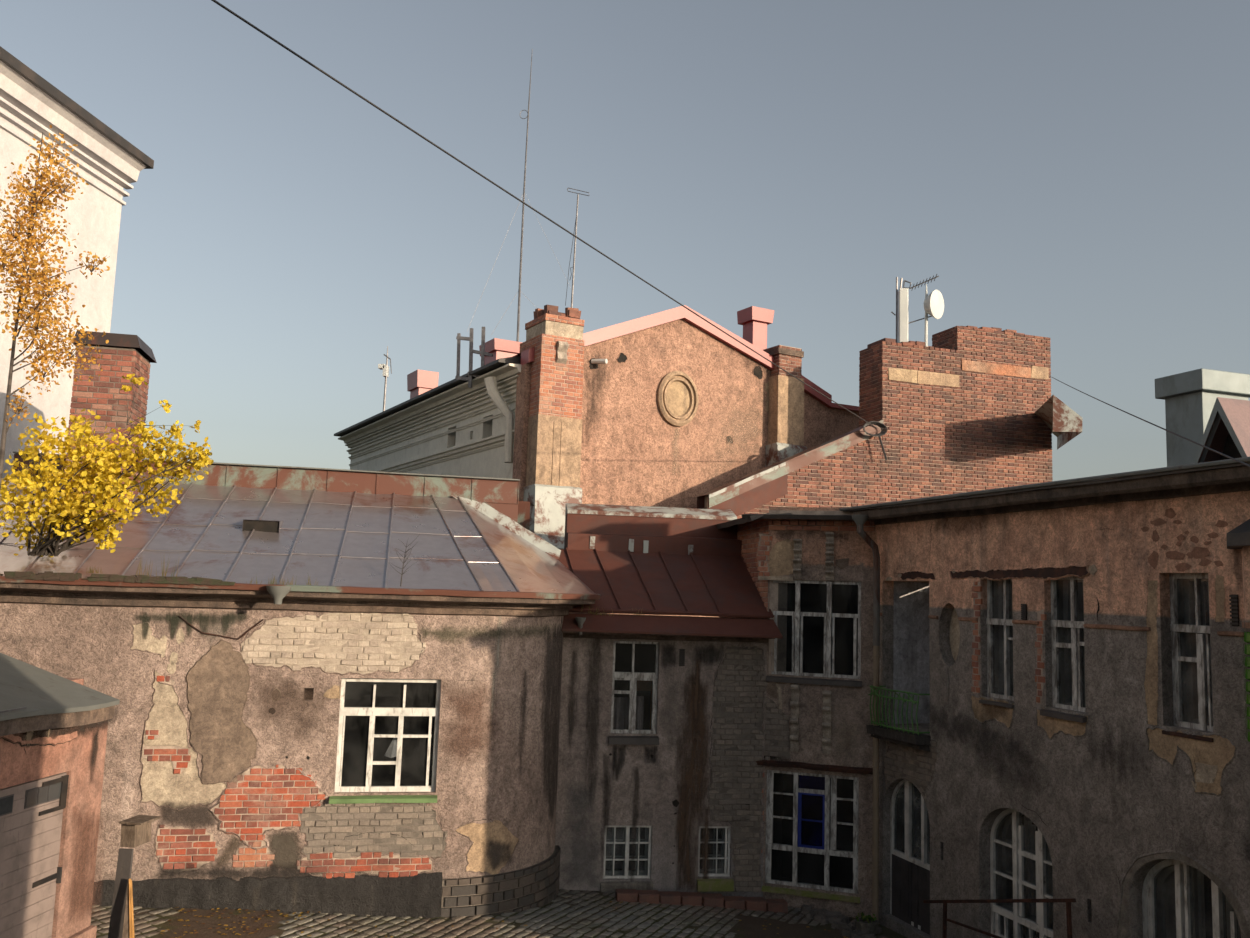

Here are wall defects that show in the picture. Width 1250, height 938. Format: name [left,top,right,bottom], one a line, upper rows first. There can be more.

leakage [170,615,230,639]
flaking render [129,612,519,878]
leakage [676,659,709,889]
flaking render [1035,609,1089,741]
flaking render [1141,508,1237,797]